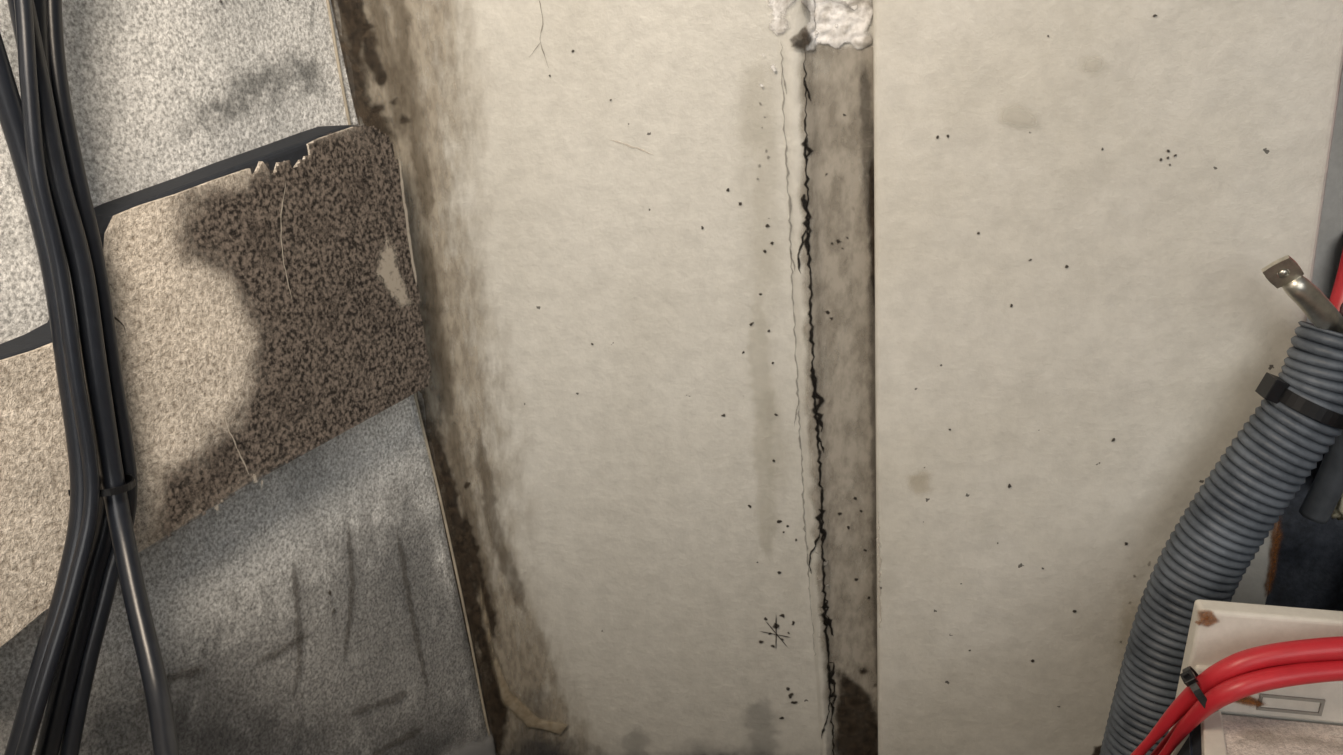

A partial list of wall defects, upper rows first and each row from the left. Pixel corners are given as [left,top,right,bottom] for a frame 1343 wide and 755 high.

leakage [155,0,581,755]
leakage [759,614,795,647]
crack [797,49,837,755]
leakage [801,45,878,755]